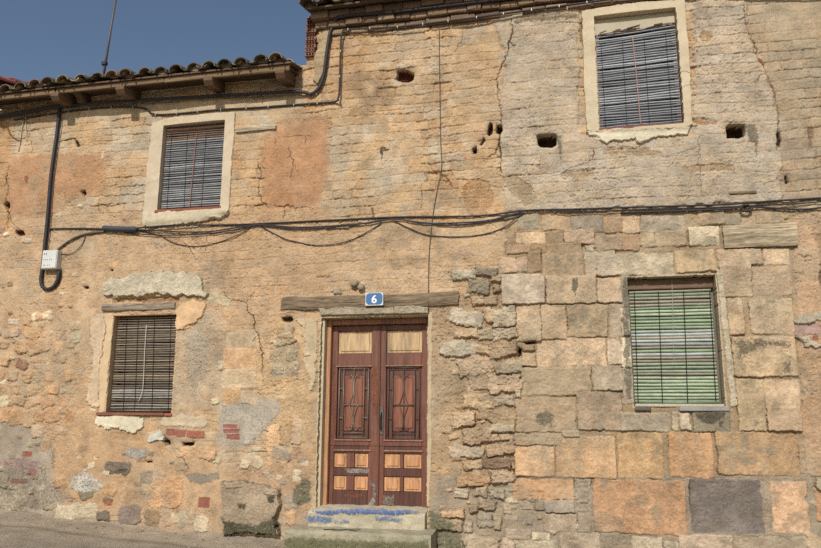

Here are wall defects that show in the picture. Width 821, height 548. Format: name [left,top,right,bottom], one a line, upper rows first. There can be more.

crack [490,21,515,173]
flaking render [86,313,207,443]
crack [225,292,264,382]
flaking render [794,336,821,349]